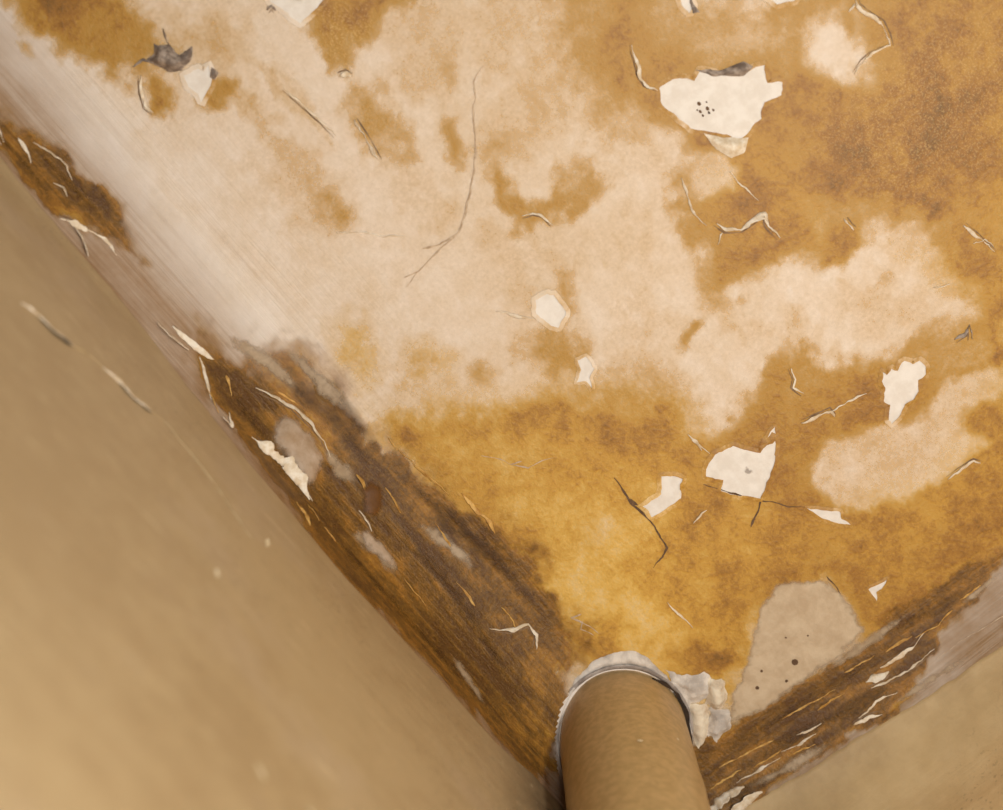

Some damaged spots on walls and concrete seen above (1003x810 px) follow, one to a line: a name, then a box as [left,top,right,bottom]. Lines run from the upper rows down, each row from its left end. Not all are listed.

leakage [3,0,179,118]
peeling [264,0,329,28]
leakage [310,0,438,73]
peeling [630,45,787,158]
leakage [0,122,145,262]
peeling [496,289,571,332]
leakage [365,0,1003,810]
peeling [877,356,930,428]
leakage [197,339,578,779]
crack [614,478,668,568]
peeling [638,472,687,521]
peeling [688,424,780,502]